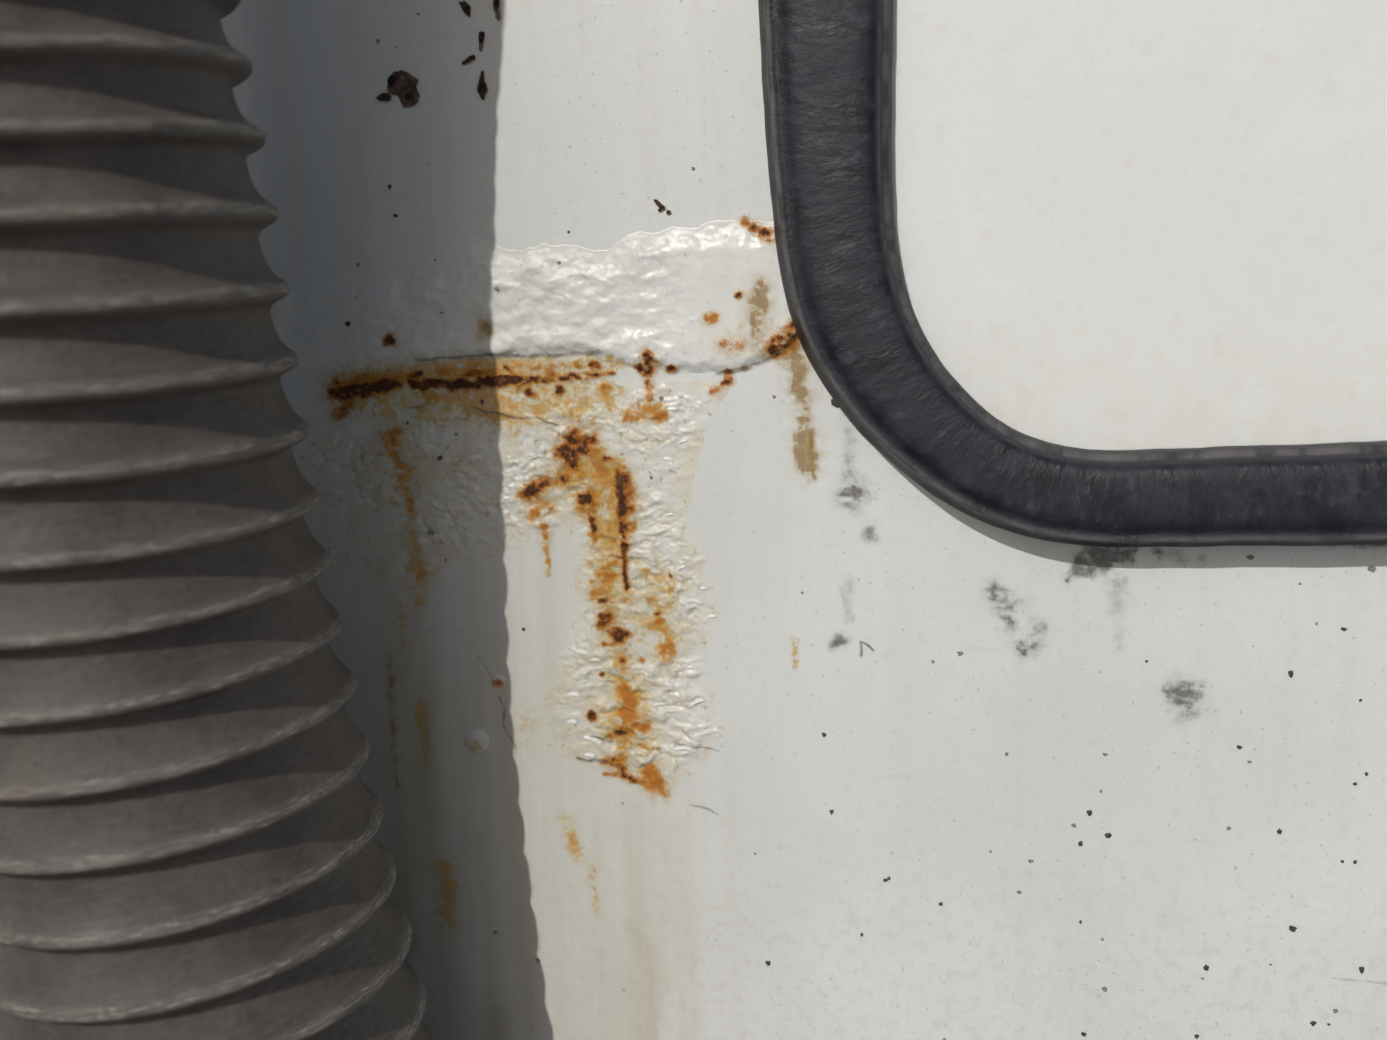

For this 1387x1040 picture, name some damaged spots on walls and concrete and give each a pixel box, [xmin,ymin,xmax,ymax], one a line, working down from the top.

peeling [458,1,471,17]
peeling [493,0,501,21]
peeling [462,31,488,100]
peeling [375,70,420,107]
corrosion [740,216,774,242]
corrosion [703,312,718,324]
corrosion [709,280,818,480]
corrosion [330,349,677,797]